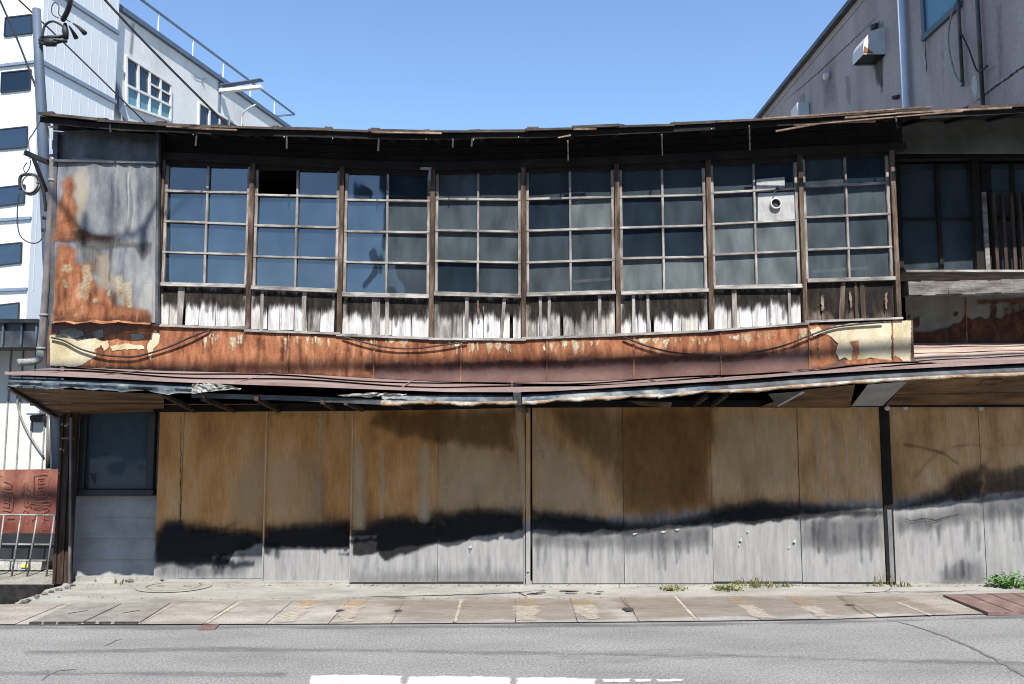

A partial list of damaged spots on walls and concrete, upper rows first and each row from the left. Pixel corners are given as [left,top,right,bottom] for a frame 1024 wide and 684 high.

corrosion [52,177,910,377]
peeling [49,328,160,367]
damp [162,281,894,329]
peeling [799,293,911,362]
corrosion [908,298,1024,343]
damp [156,412,882,570]
damp [899,472,1024,526]